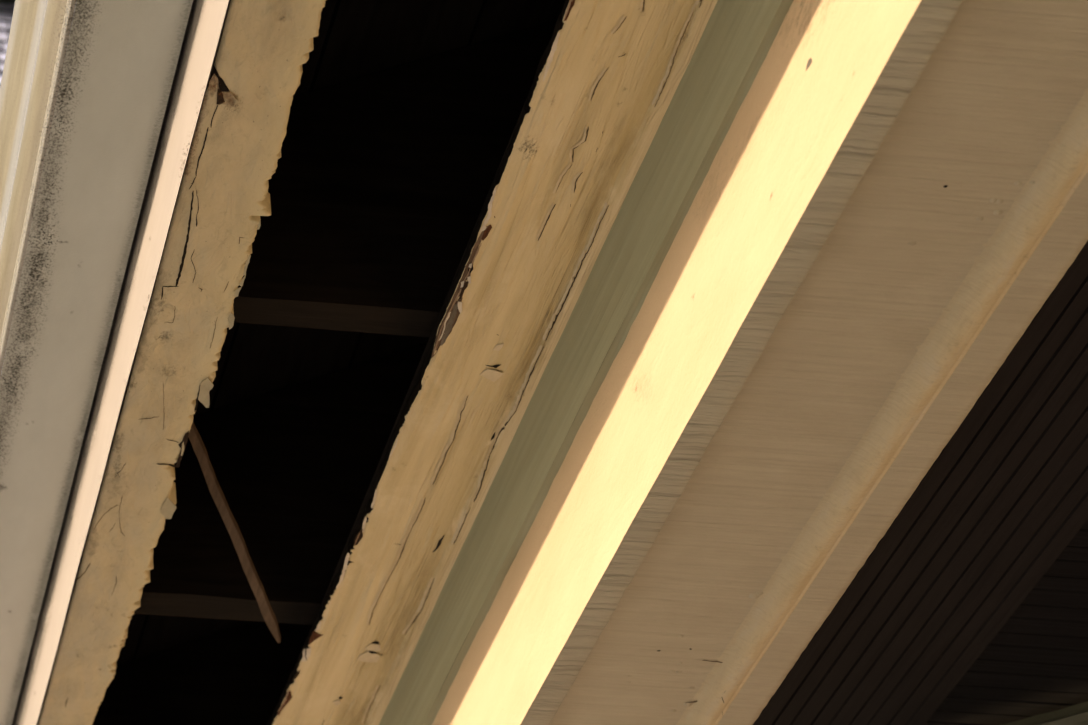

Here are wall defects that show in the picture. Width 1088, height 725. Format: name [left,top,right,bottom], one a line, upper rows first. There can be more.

spalling [207,65,239,107]
leakage [0,0,94,461]
crack [161,105,229,323]
peeling [234,255,251,297]
crack [535,127,603,241]
crack [138,385,176,467]
peeling [198,377,214,408]
crack [402,202,609,634]
peeling [160,498,177,519]
peeling [336,490,377,589]
crack [367,395,468,626]
peeling [277,621,323,716]